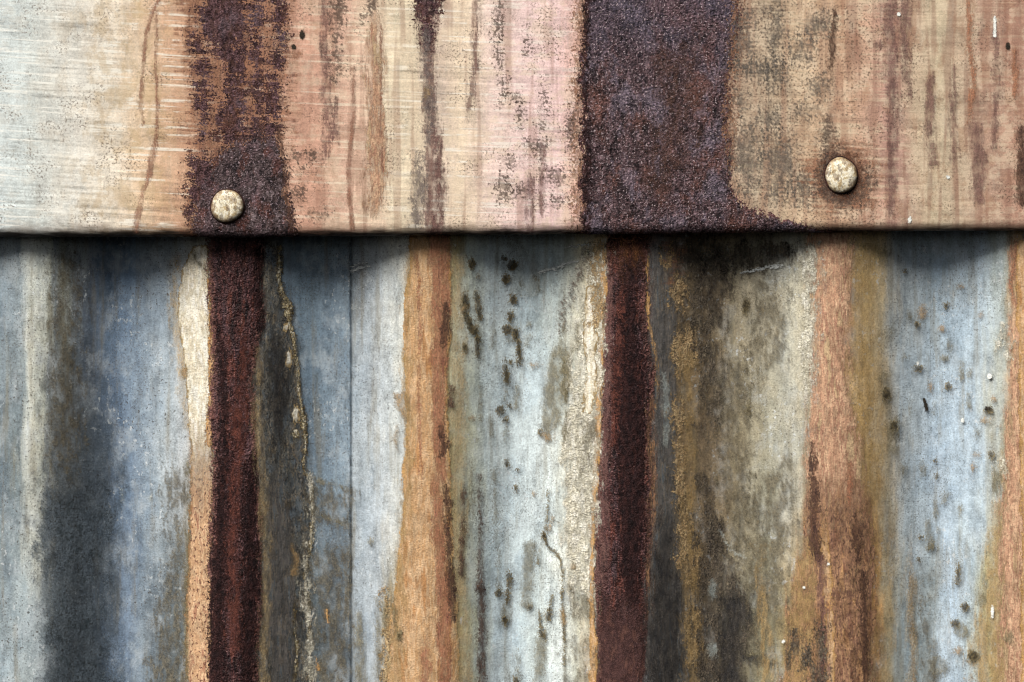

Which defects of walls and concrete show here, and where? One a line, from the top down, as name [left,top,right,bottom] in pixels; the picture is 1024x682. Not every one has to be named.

corrosion [175,0,302,682]
corrosion [376,0,460,682]
leakage [685,471,758,682]
corrosion [564,0,892,682]
corrosion [889,416,906,474]
corrosion [917,498,946,563]